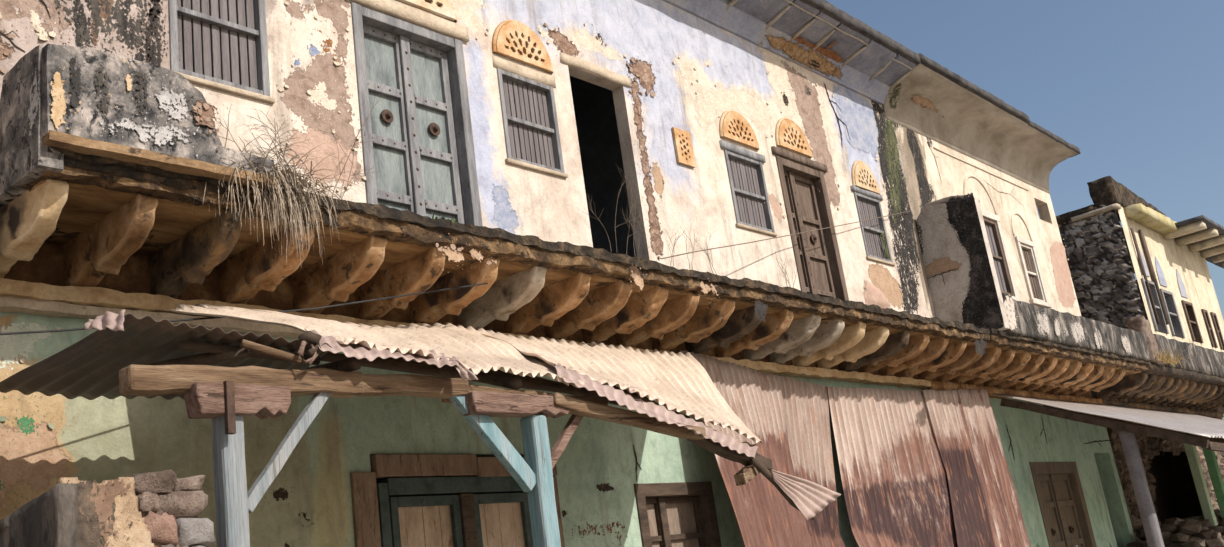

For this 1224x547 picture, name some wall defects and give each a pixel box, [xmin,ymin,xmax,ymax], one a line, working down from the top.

damp [18,0,185,151]
peeling [272,0,366,200]
peeling [537,15,882,262]
damp [869,100,1004,362]